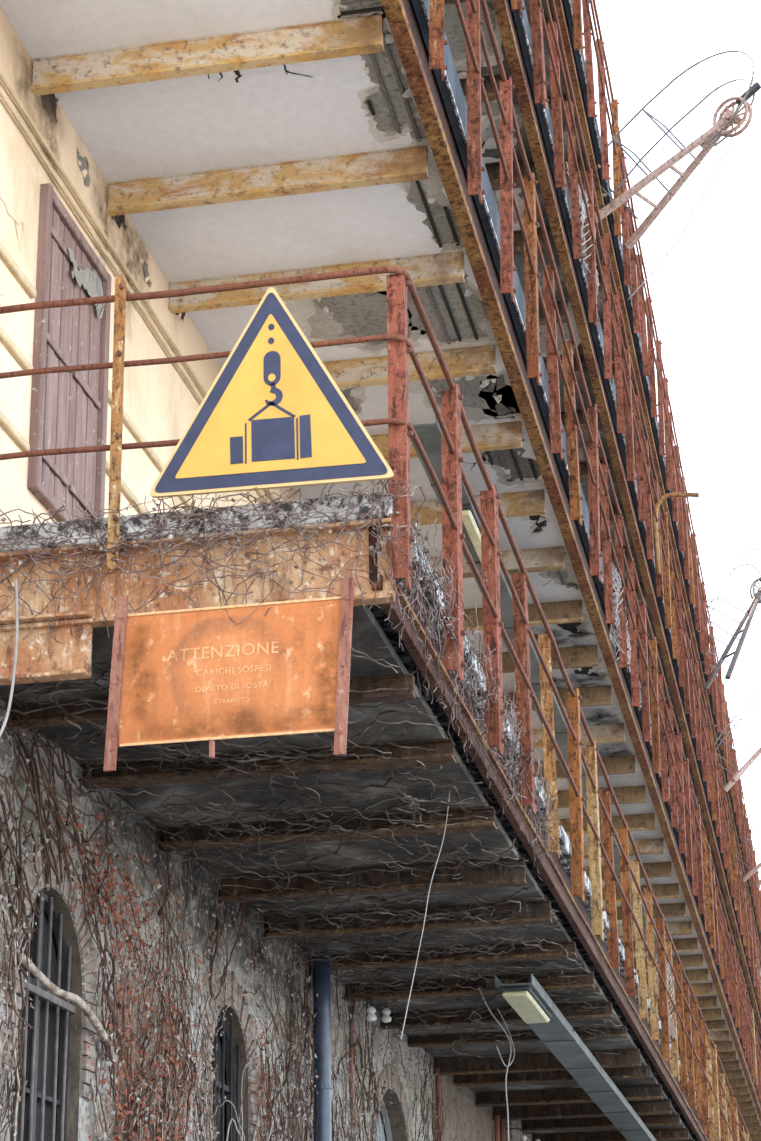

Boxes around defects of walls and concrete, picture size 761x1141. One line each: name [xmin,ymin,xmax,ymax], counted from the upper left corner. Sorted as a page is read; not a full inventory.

crack [208,70,242,83]
flaking render [331,0,467,255]
flaking render [285,291,387,356]
flaking render [407,273,498,350]
flaking render [340,387,366,415]
flaking render [408,368,545,489]